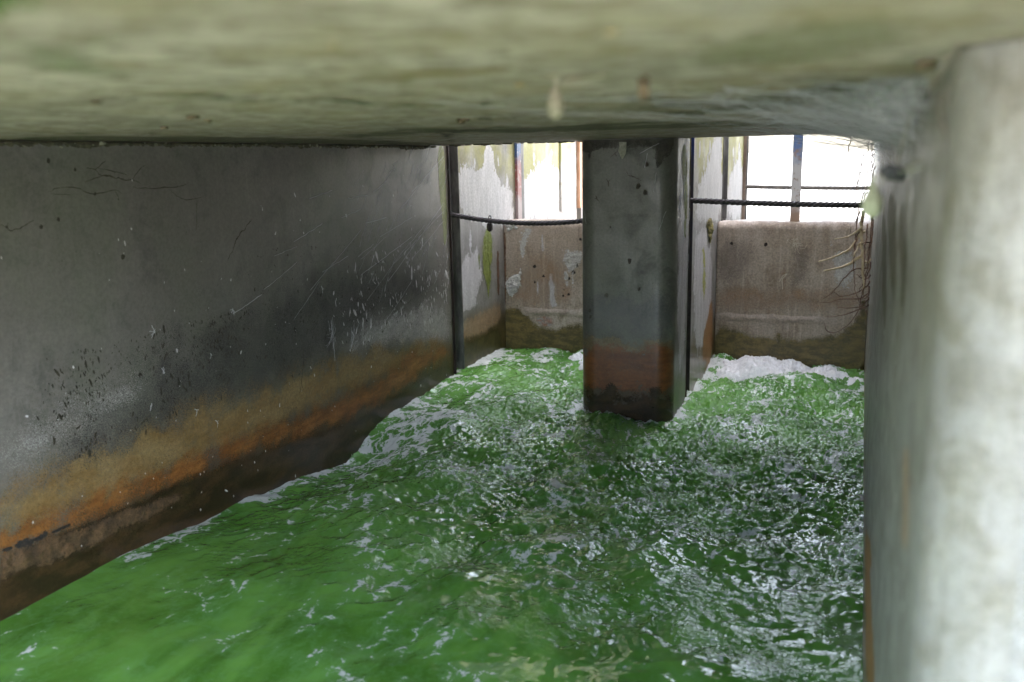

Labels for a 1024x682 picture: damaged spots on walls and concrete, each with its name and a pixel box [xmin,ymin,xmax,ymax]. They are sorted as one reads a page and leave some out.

leakage [0,227,471,621]
leakage [8,77,886,374]
corrosion [583,341,674,395]